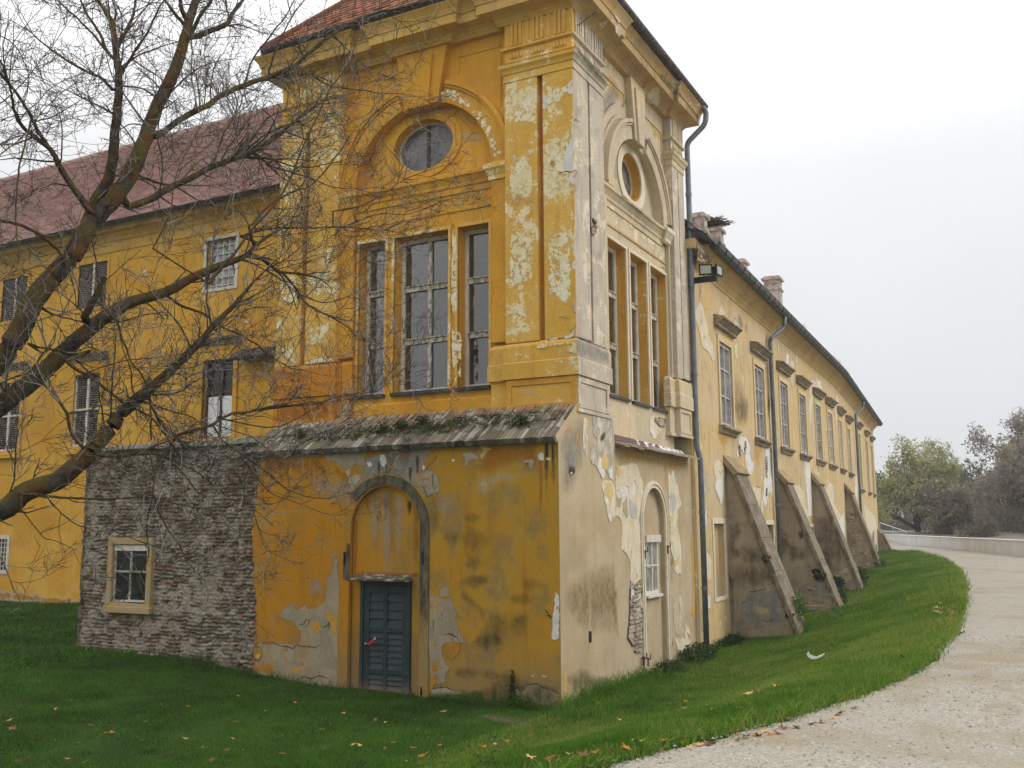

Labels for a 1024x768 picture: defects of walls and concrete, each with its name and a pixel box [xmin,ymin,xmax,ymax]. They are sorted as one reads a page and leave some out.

flaking render [323,446,492,497]
flaking render [582,415,645,600]
flaking render [667,470,712,651]
flaking render [737,435,781,514]
flaking render [794,452,877,568]
flaking render [251,559,339,687]
flaking render [429,586,481,700]